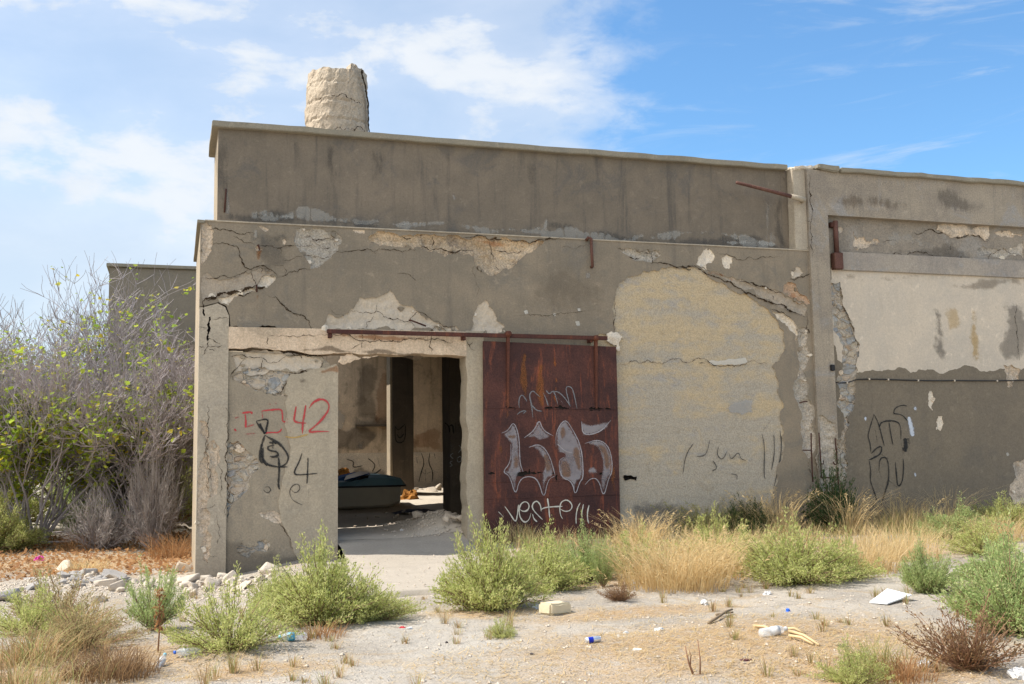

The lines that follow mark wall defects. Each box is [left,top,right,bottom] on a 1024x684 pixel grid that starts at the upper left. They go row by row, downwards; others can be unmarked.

spalling [282,227,342,269]
spalling [353,230,544,276]
spalling [838,227,880,251]
spalling [976,230,1024,259]
crack [200,227,571,393]
spalling [325,290,505,333]
spalling [231,350,323,396]
peeling [590,248,860,536]
crack [205,405,230,557]
spalling [195,421,261,563]